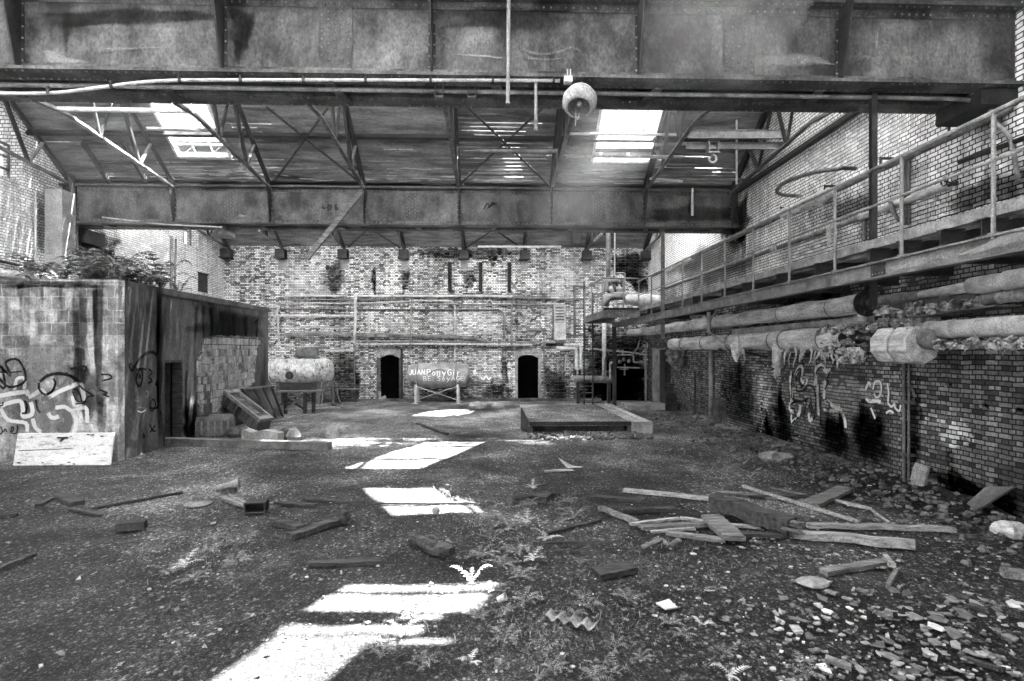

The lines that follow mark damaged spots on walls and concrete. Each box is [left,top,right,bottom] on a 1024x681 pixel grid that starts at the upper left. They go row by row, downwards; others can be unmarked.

water stain [807,381,889,463]